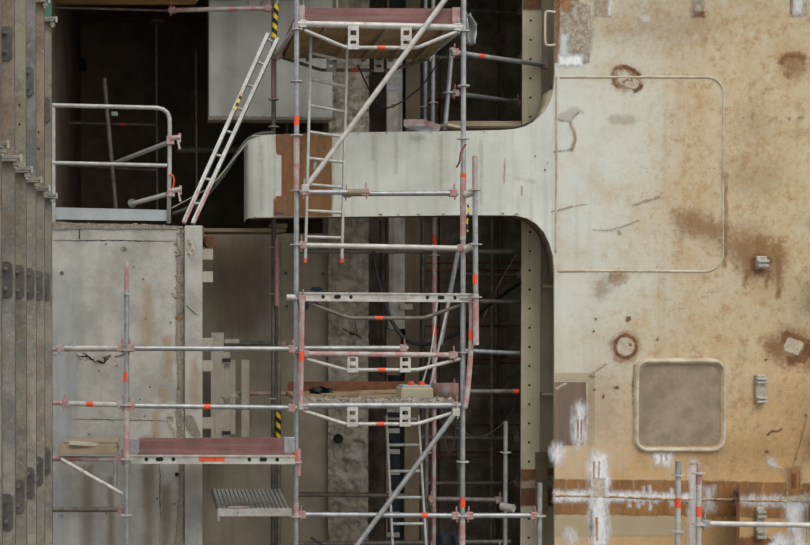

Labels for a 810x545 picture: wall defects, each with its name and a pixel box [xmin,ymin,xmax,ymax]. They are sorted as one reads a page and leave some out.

rust [554,0,579,63]
rust [611,64,643,93]
crack [53,353,123,364]
rust [614,334,638,367]
rust [781,331,810,365]